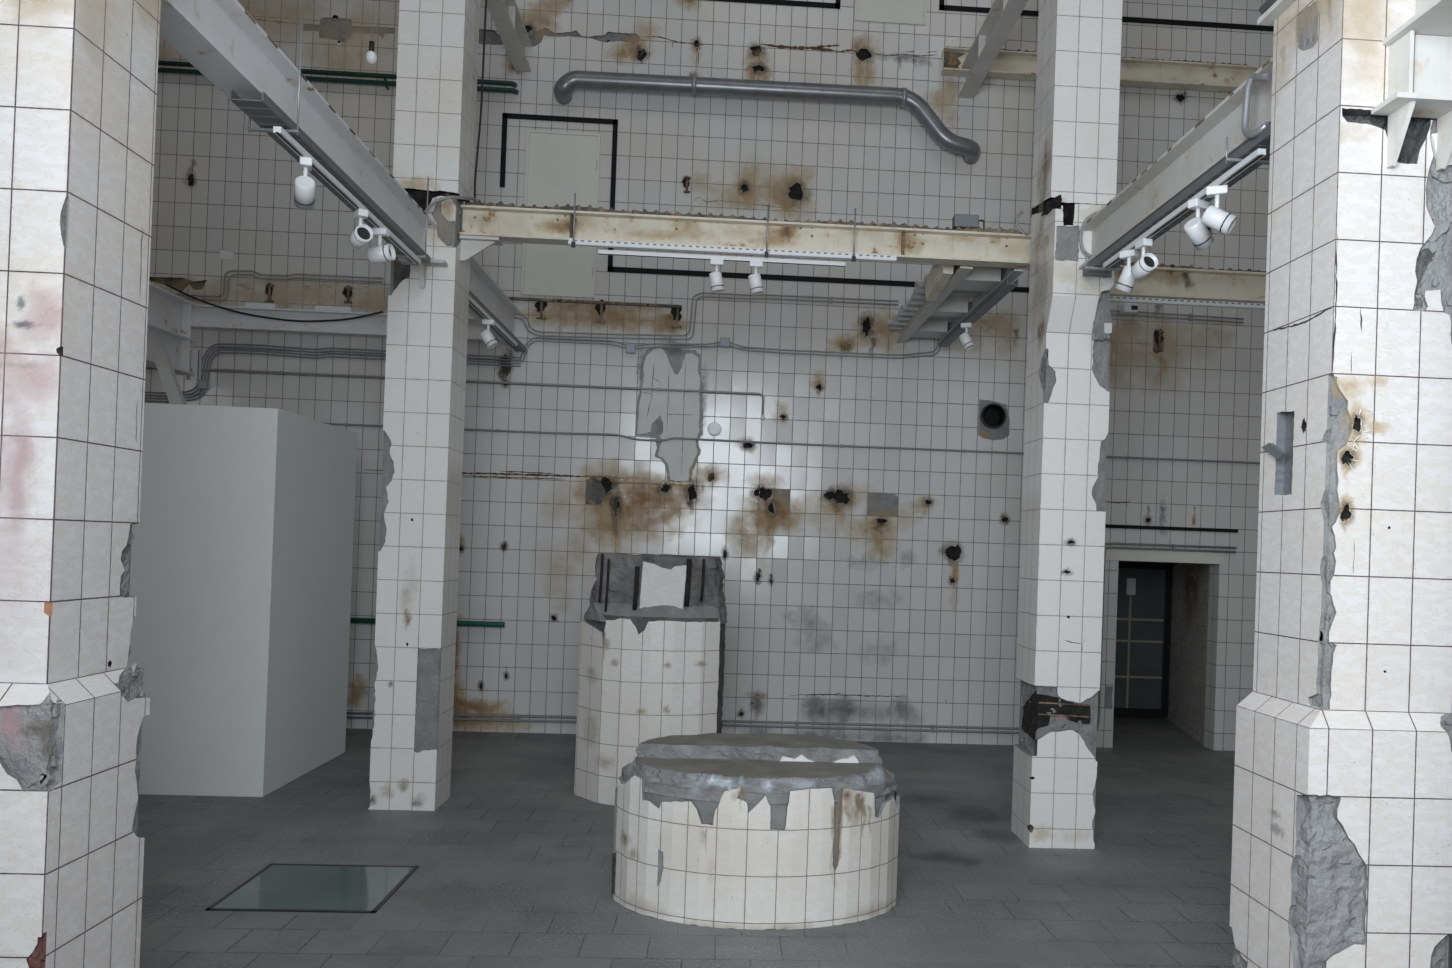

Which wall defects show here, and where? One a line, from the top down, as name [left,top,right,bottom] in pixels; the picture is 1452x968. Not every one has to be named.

crack [644,36,704,64]
crack [760,44,936,62]
corrosion [855,40,871,74]
corrosion [739,176,804,243]
spalling [1413,120,1452,343]
corrosion [576,472,716,537]
corrosion [738,487,799,541]
spalling [1311,380,1350,709]
spalling [0,691,62,791]
corrosion [453,683,511,728]
spalling [1019,680,1095,756]
spalling [1292,795,1365,968]